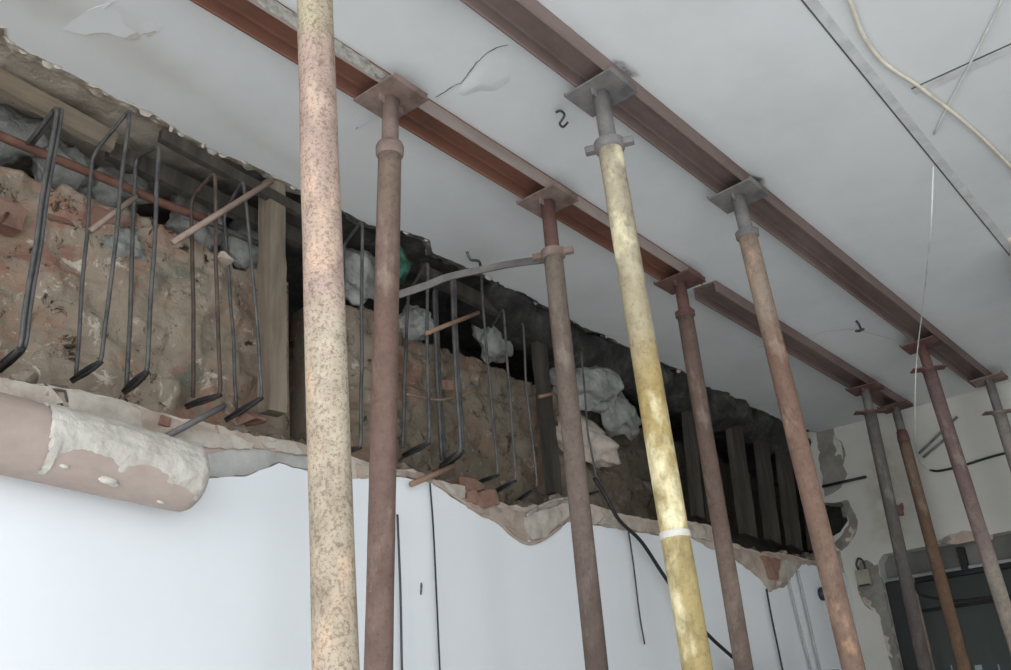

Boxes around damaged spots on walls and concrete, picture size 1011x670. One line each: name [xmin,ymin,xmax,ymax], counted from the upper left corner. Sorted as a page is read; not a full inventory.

peeling [63,0,172,40]
flaking render [0,27,308,478]
spalling [341,210,376,453]
peeling [396,230,570,545]
flaking render [570,320,629,348]
flaking render [591,509,660,535]
spalling [671,429,684,446]
spalling [716,449,730,464]
spalling [745,449,757,477]
peeling [733,465,816,592]
flaking render [806,428,858,551]
flaking render [857,560,903,670]